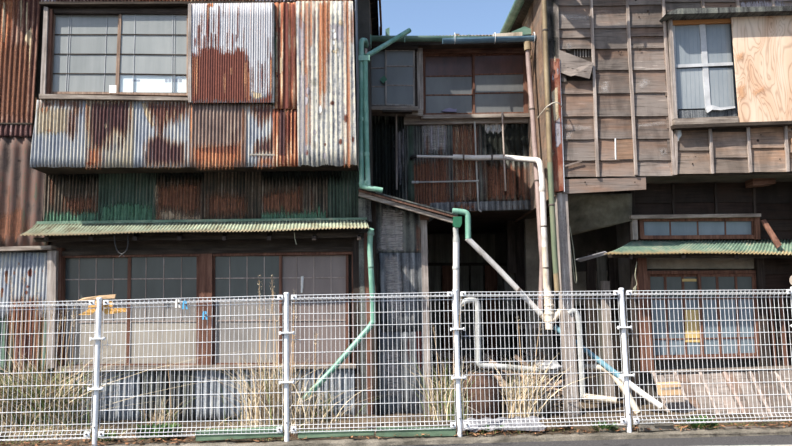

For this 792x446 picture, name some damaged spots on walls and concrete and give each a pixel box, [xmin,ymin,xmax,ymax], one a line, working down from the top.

corrosion [142,0,354,169]
corrosion [155,182,201,220]
corrosion [411,126,530,210]